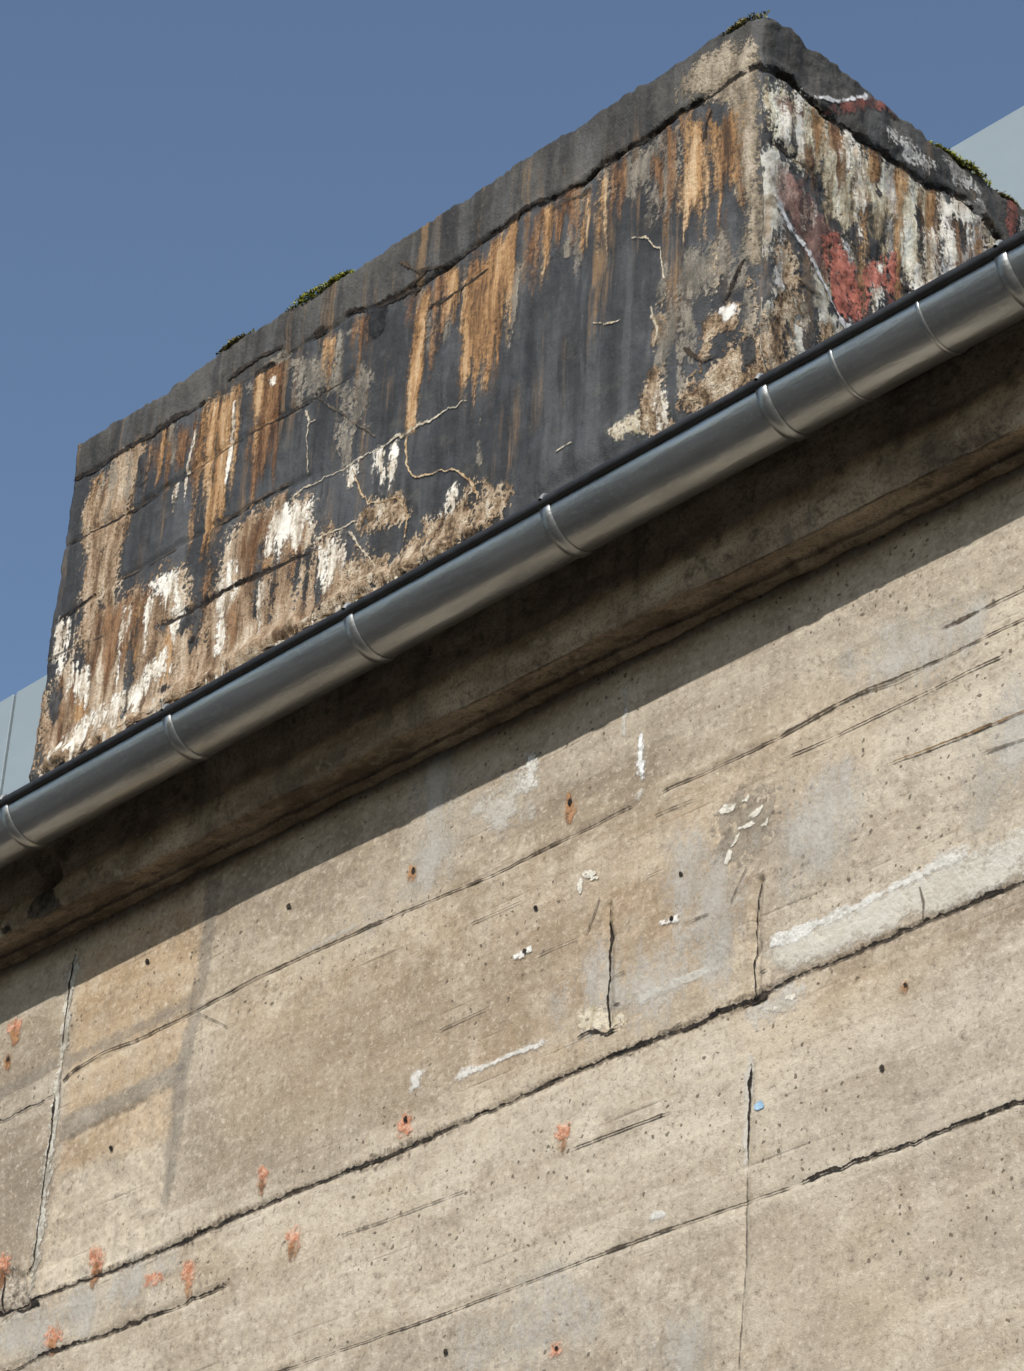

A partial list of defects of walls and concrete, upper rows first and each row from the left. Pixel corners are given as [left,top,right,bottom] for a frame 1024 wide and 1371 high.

corrosion [405,158,627,432]
corrosion [651,103,746,242]
peeling [598,38,988,441]
corrosion [805,107,985,309]
corrosion [82,362,283,562]
peeling [292,347,372,469]
leakage [343,439,399,489]
leakage [440,482,458,518]
leakage [39,496,431,777]
crack [0,588,1024,1317]
crack [278,1054,1024,1371]
crack [6,1283,227,1371]